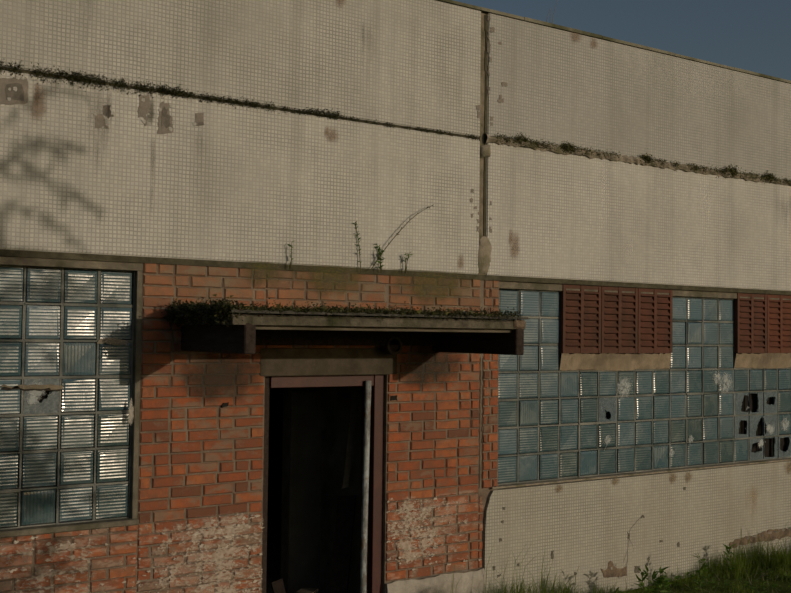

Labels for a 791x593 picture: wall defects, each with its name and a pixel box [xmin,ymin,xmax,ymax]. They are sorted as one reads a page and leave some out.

peeling [0,75,28,105]
peeling [94,105,115,129]
peeling [137,95,175,134]
peeling [193,113,204,126]
peeling [386,497,468,571]
spalling [729,527,791,548]
peeling [0,534,108,593]
peeling [122,513,264,593]
peeling [601,561,648,578]